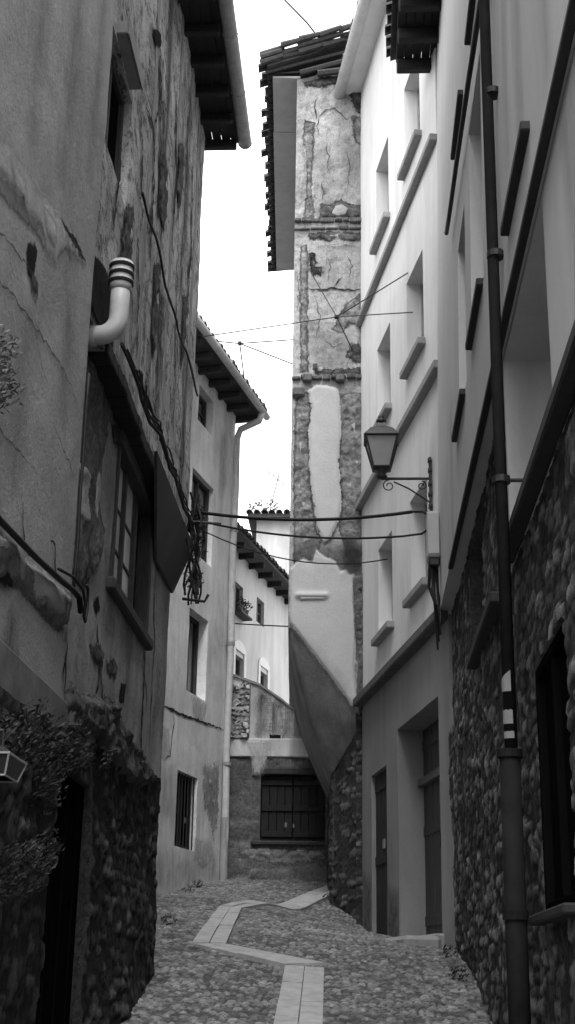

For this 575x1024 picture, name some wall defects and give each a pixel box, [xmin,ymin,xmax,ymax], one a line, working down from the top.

spalling [303,76,338,89]
spalling [302,120,361,219]
crack [314,98,351,200]
spalling [349,92,361,145]
crack [0,232,38,279]
crack [62,220,86,262]
spalling [299,231,361,376]
flaking render [292,392,323,564]
flaking render [338,392,363,693]